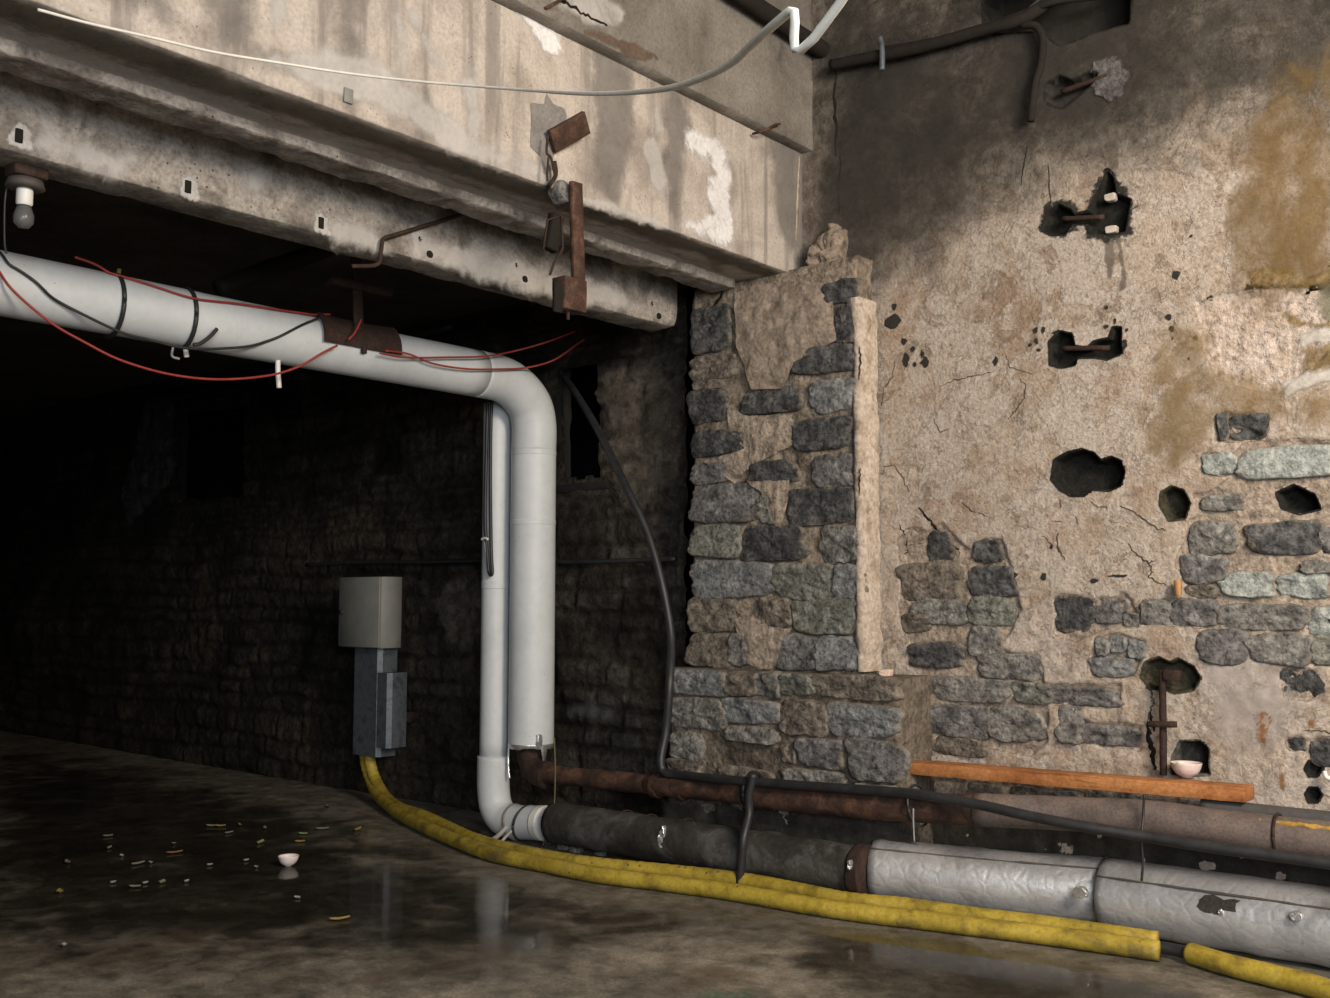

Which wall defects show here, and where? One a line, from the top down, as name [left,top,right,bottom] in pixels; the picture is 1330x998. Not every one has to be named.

crack [562,0,608,26]
damp [829,0,1239,259]
damp [1105,237,1126,290]
peeling [734,281,836,390]
spalling [884,304,929,368]
spalling [1028,326,1059,352]
peeling [1187,266,1330,398]
spalling [895,412,1330,758]
spalling [1170,739,1211,777]
spalling [1286,736,1330,767]